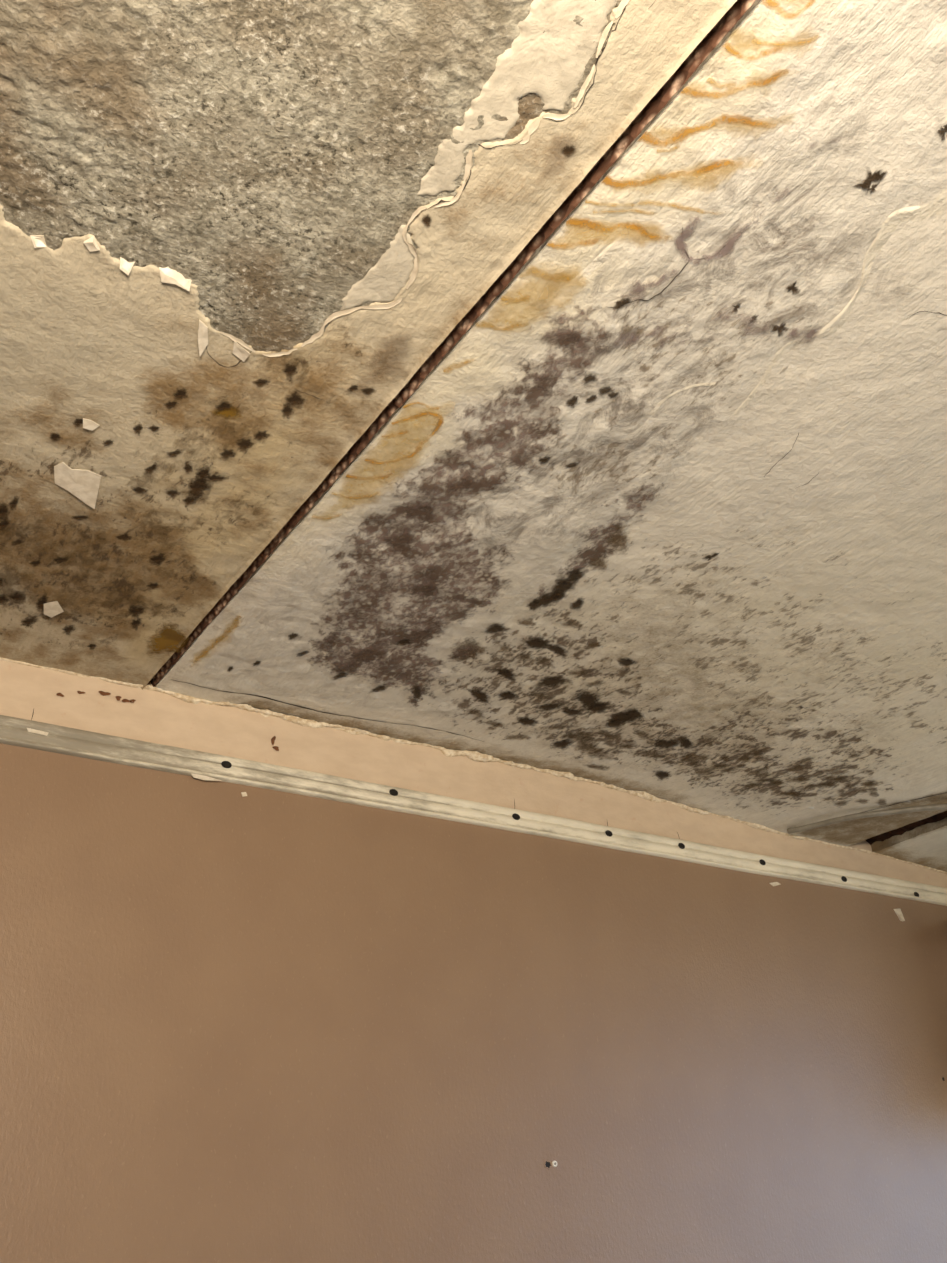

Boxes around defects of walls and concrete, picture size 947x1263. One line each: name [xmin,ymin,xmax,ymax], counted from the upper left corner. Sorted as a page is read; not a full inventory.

crack [570,0,656,116]
spalling [0,0,630,362]
crack [420,140,522,212]
water stain [854,170,887,193]
water stain [675,217,699,260]
water stain [707,229,745,260]
water stain [616,271,675,308]
water stain [165,389,187,409]
water stain [282,359,307,418]
water stain [0,401,269,654]
water stain [297,304,902,814]